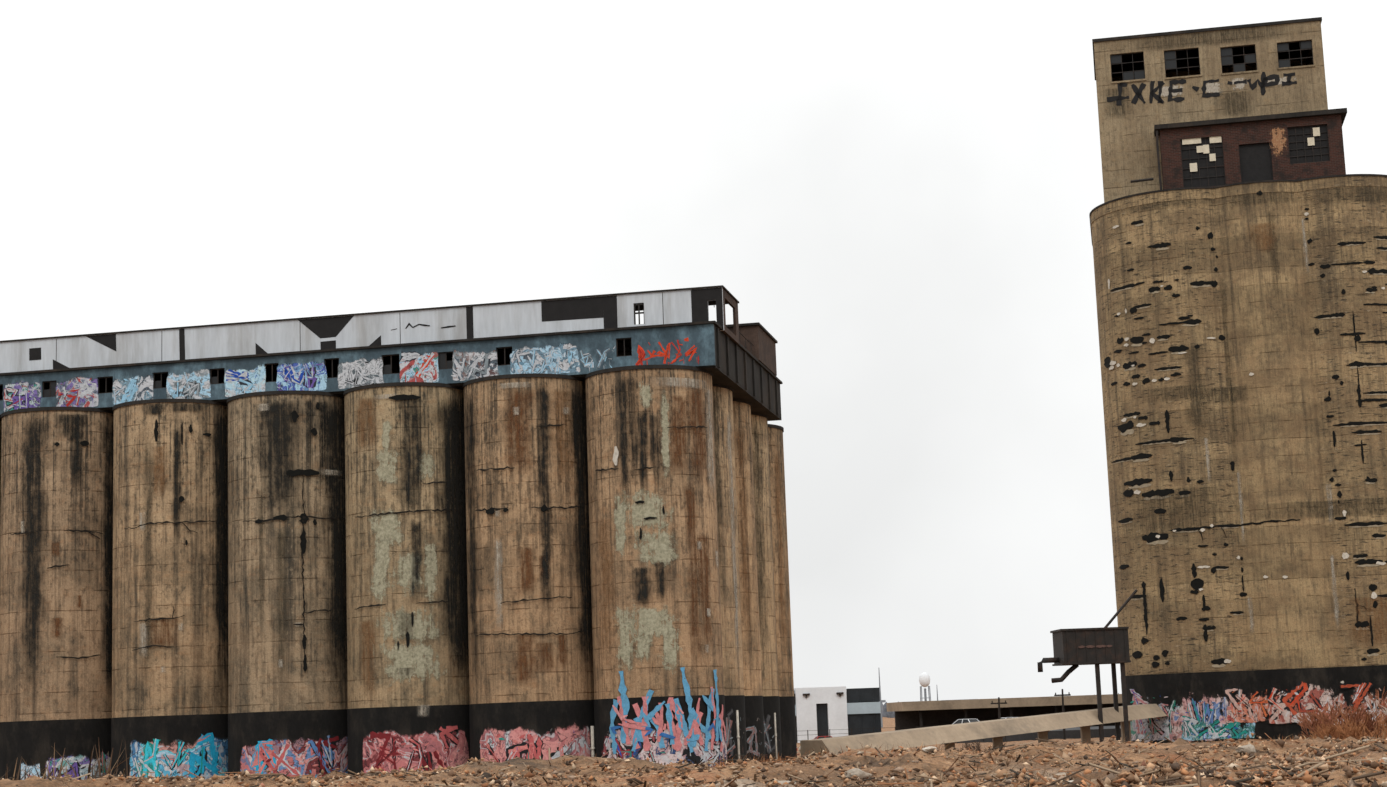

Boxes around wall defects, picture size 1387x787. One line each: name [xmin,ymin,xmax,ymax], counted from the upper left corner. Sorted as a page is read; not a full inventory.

spalling [1104,226,1225,386]
spalling [1308,236,1387,484]
damp [21,414,83,678]
damp [103,425,113,686]
damp [140,450,152,651]
damp [173,431,181,536]
damp [213,415,228,676]
peeling [370,510,447,682]
damp [501,382,593,662]
peeling [616,607,682,675]
spalling [1329,469,1387,539]
spalling [1355,584,1387,661]